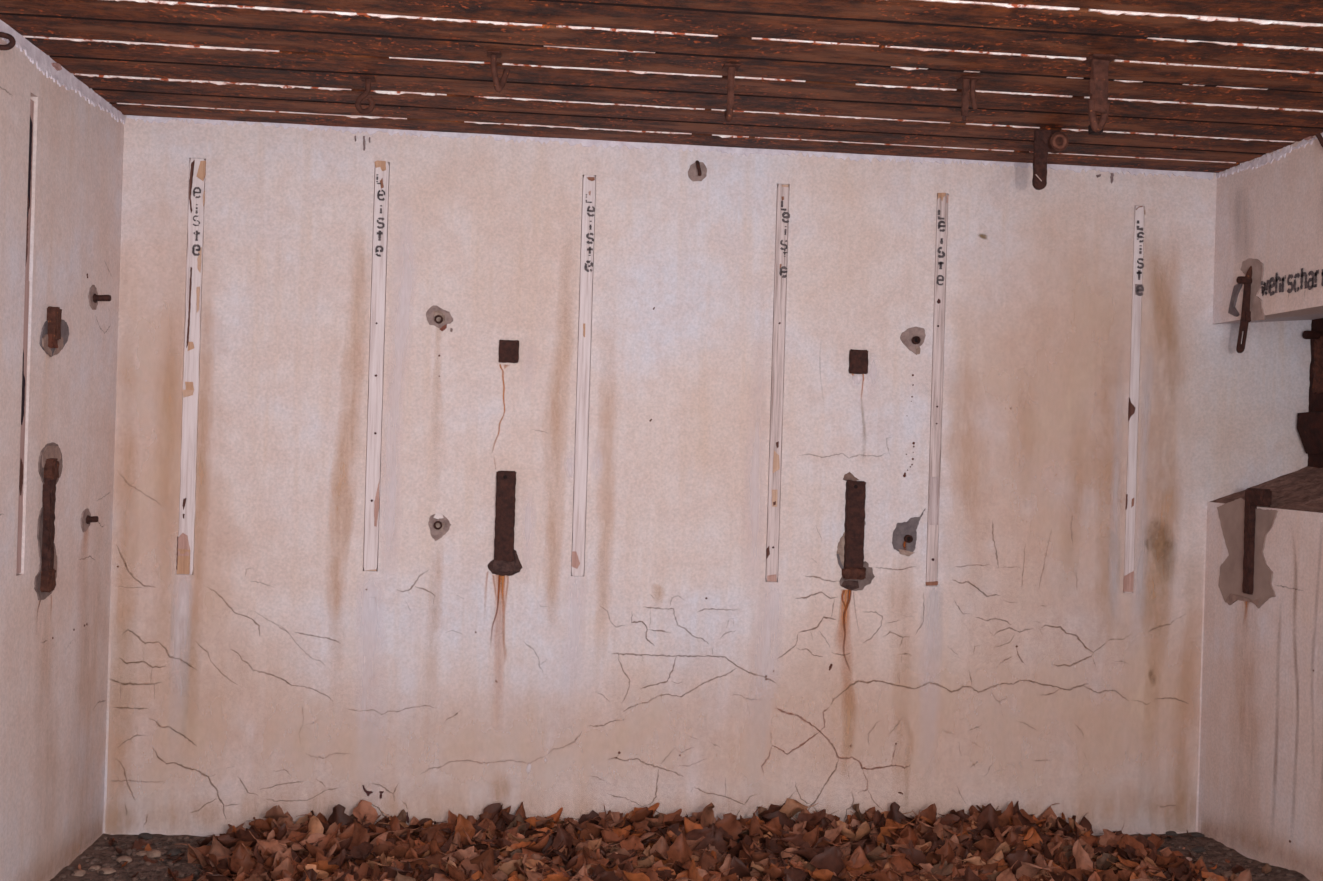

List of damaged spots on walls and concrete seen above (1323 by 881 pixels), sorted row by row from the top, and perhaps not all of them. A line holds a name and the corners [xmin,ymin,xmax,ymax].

rust [493,575,504,624]
rust [842,590,851,657]
crack [623,607,1101,804]
crack [157,725,242,805]